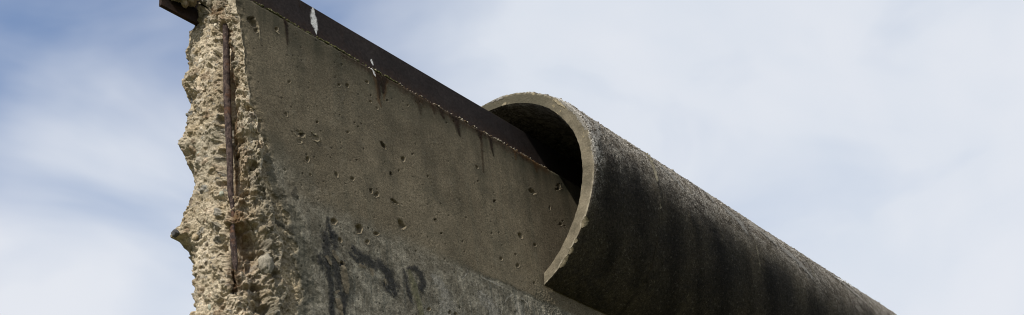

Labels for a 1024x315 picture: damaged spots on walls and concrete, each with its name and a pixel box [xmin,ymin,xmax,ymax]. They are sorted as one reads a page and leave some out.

spalling [170,0,293,315]